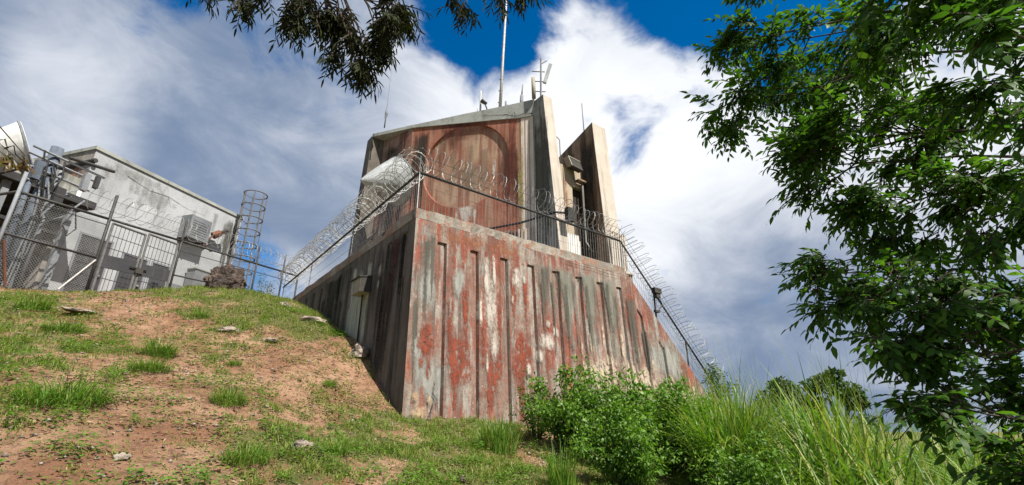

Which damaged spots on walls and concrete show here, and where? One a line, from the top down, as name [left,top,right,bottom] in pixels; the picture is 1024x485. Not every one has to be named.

rust [443,123,481,158]
rust [502,137,518,200]
rust [417,324,435,379]
rust [439,227,556,421]